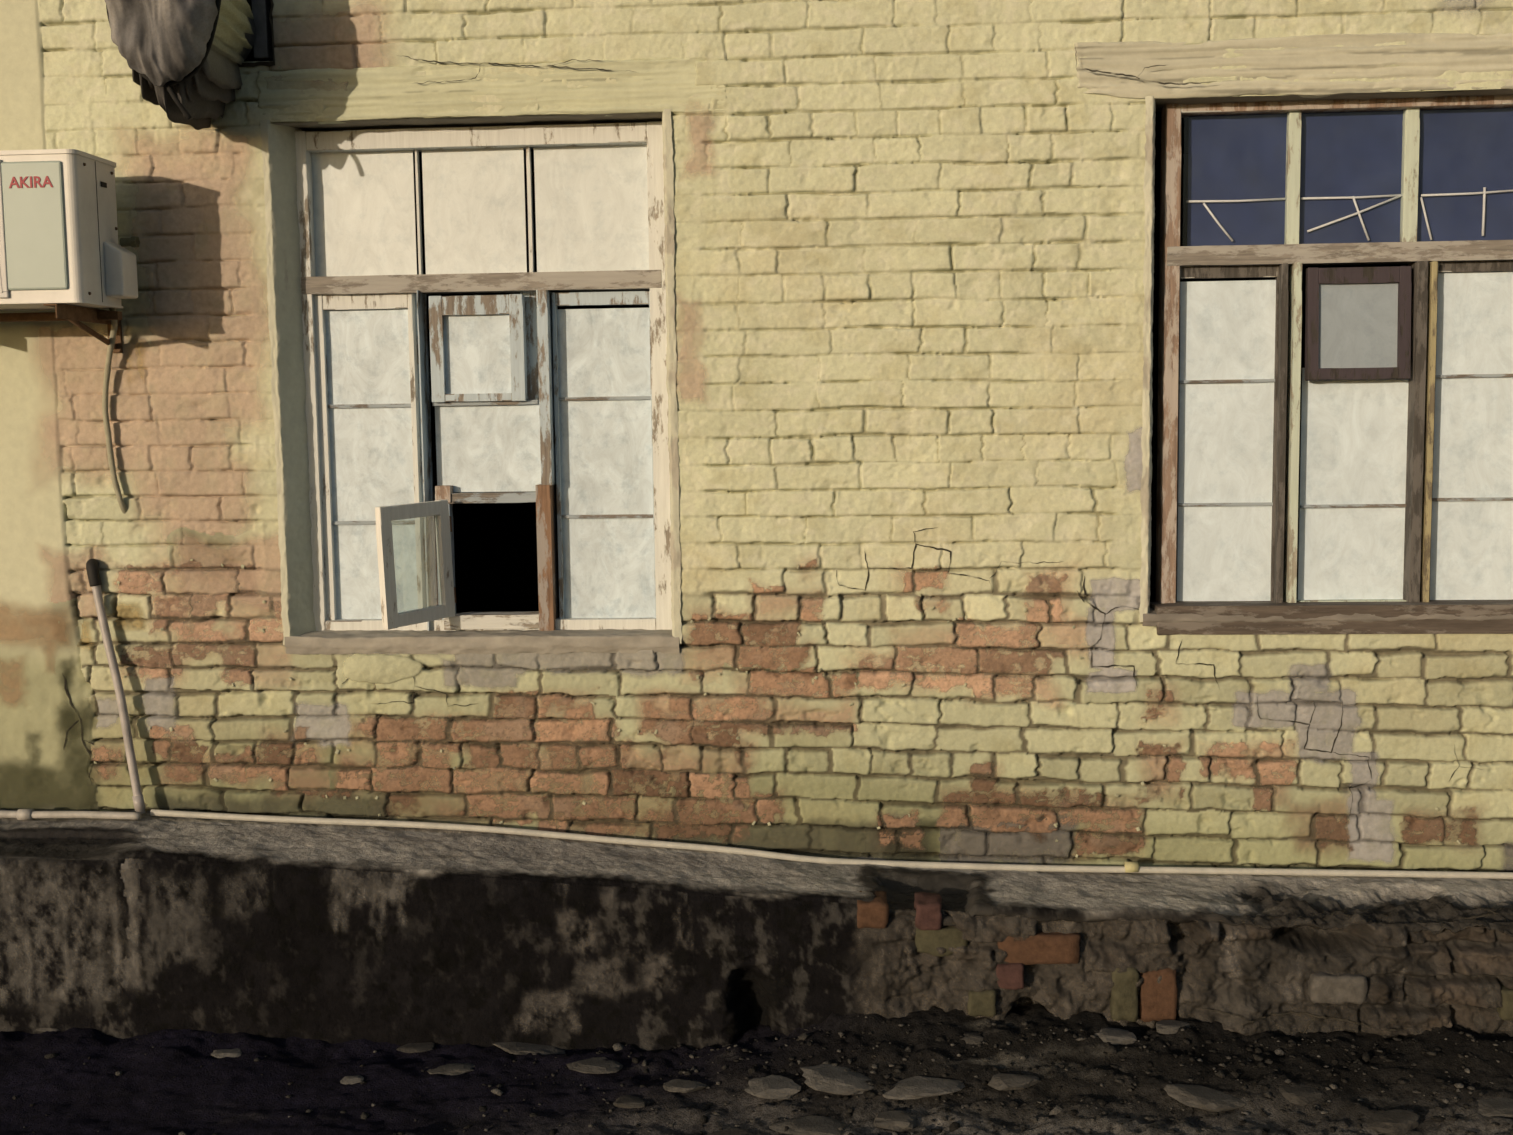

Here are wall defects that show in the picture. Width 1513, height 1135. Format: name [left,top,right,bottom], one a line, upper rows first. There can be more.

peeling [115,559,284,687]
leakage [144,677,177,730]
leakage [294,703,350,746]
peeling [149,566,1086,842]
leakage [0,699,203,1002]
peeling [877,739,1298,857]
peeling [1308,811,1353,851]
peeling [1401,807,1477,846]
leakage [332,870,407,930]
leakage [558,912,627,995]
spalling [856,866,1513,1039]
leakage [520,991,579,1031]